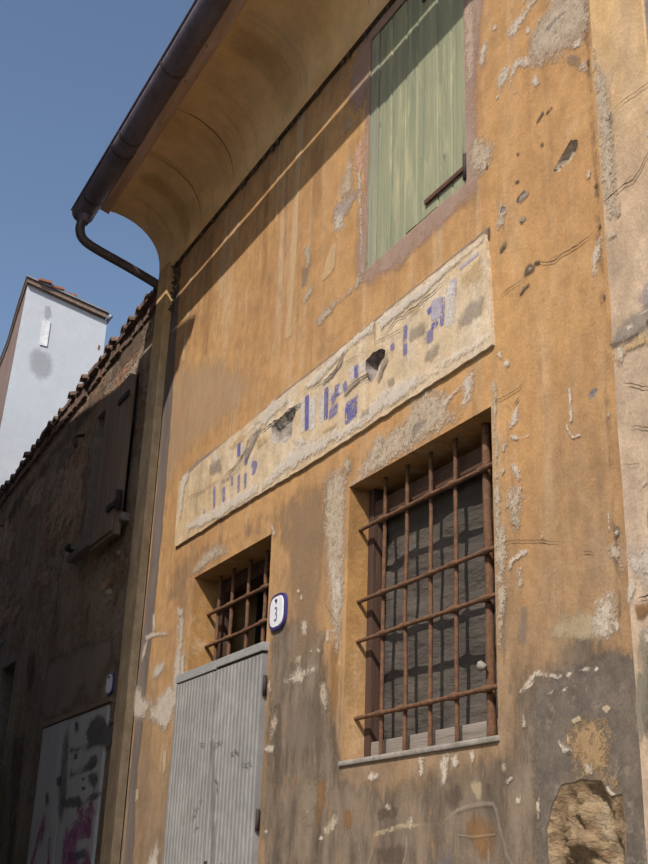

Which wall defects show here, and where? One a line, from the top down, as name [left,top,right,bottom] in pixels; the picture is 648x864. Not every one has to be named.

peeling [490,0,590,106]
flaking render [303,0,494,326]
spalling [551,140,578,174]
crack [602,153,648,203]
peeling [307,203,506,386]
crack [535,227,597,264]
crack [189,282,443,497]
peeling [179,336,484,654]
peeling [133,607,185,730]
peeling [283,648,321,684]
peeling [591,592,621,639]
water stain [262,612,612,864]